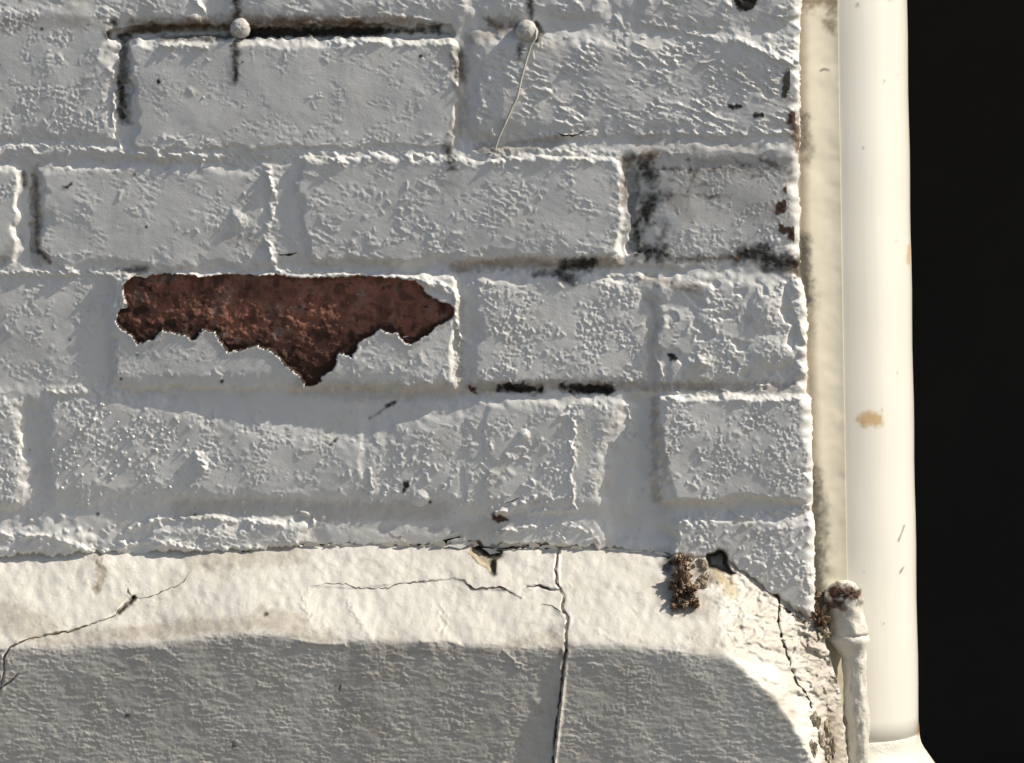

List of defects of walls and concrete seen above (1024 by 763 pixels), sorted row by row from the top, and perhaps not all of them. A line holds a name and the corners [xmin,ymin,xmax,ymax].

leakage [623,152,680,181]
leakage [632,195,812,304]
spalling [116,273,454,386]
crack [0,552,187,689]
crack [301,536,696,763]
spalling [706,550,732,593]
crack [773,594,814,714]
leakage [812,475,822,592]